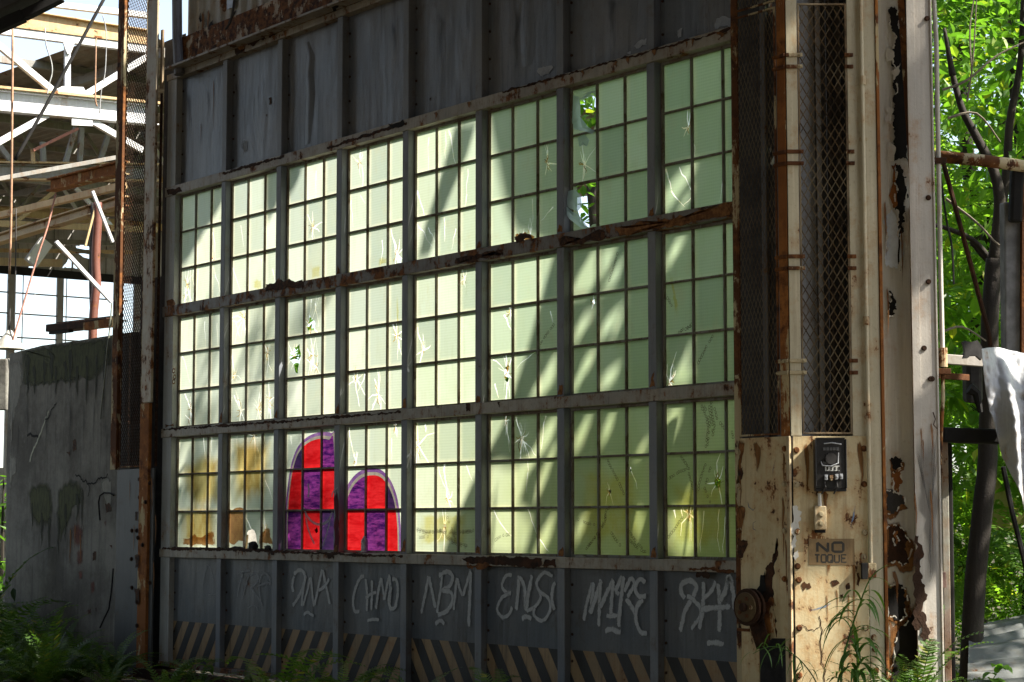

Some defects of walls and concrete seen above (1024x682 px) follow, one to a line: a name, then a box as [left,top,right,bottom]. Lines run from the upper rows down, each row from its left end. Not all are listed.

peeling [886,47,900,80]
corrosion [455,241,502,264]
corrosion [515,232,534,243]
corrosion [557,202,731,246]
peeling [883,142,904,273]
corrosion [265,278,303,291]
damp [10,350,105,440]
crack [27,404,56,461]
corrosion [736,441,761,558]
corrosion [462,546,564,570]
peeling [757,572,776,640]